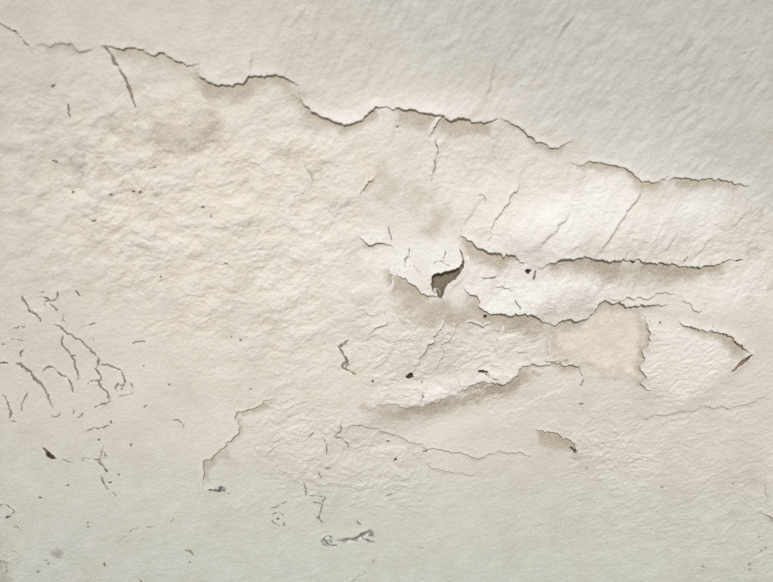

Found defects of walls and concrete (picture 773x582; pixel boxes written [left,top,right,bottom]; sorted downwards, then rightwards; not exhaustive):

crack [104,46,136,107]
peeling [98,41,301,95]
peeling [300,94,573,151]
peeling [570,153,752,188]
peeling [385,183,755,393]
crack [0,290,147,431]
crack [304,473,375,562]